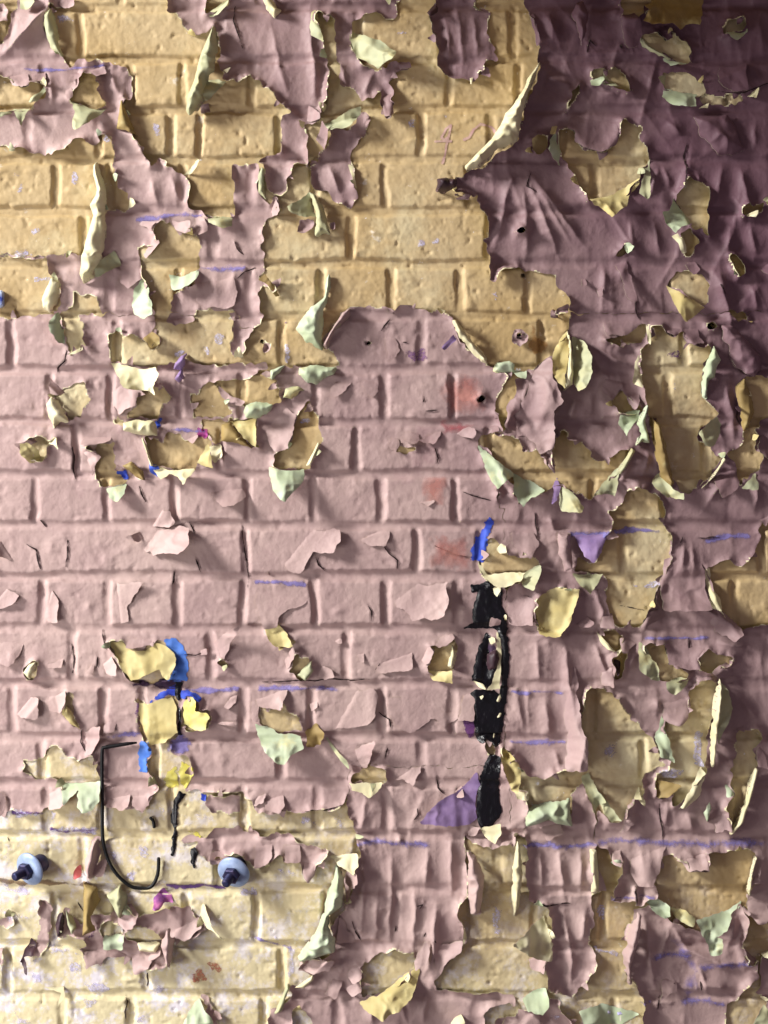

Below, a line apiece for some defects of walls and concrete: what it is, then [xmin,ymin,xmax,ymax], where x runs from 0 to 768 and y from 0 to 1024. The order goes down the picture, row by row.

peeling [0,0,411,358]
peeling [0,257,639,1024]
peeling [427,0,768,1024]